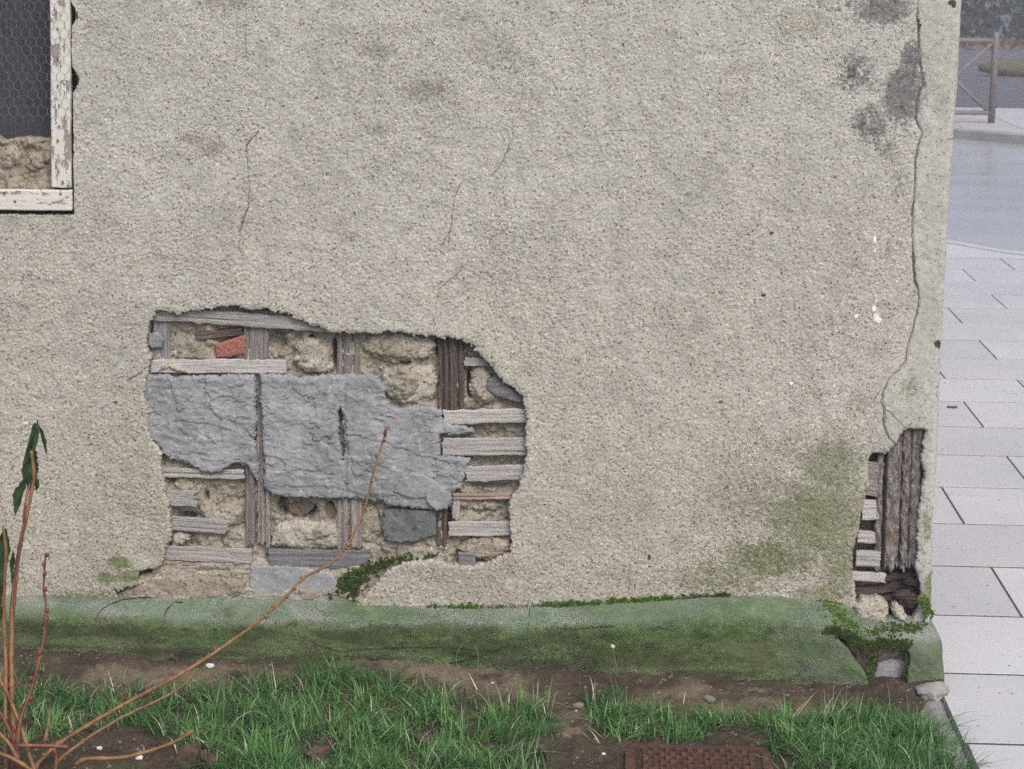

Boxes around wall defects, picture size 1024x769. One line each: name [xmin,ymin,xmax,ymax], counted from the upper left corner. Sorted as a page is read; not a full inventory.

crack [238,131,258,258]
leakage [840,0,911,24]
leakage [840,44,927,163]
crack [874,8,924,438]
spalling [119,306,527,601]
spalling [852,428,932,622]